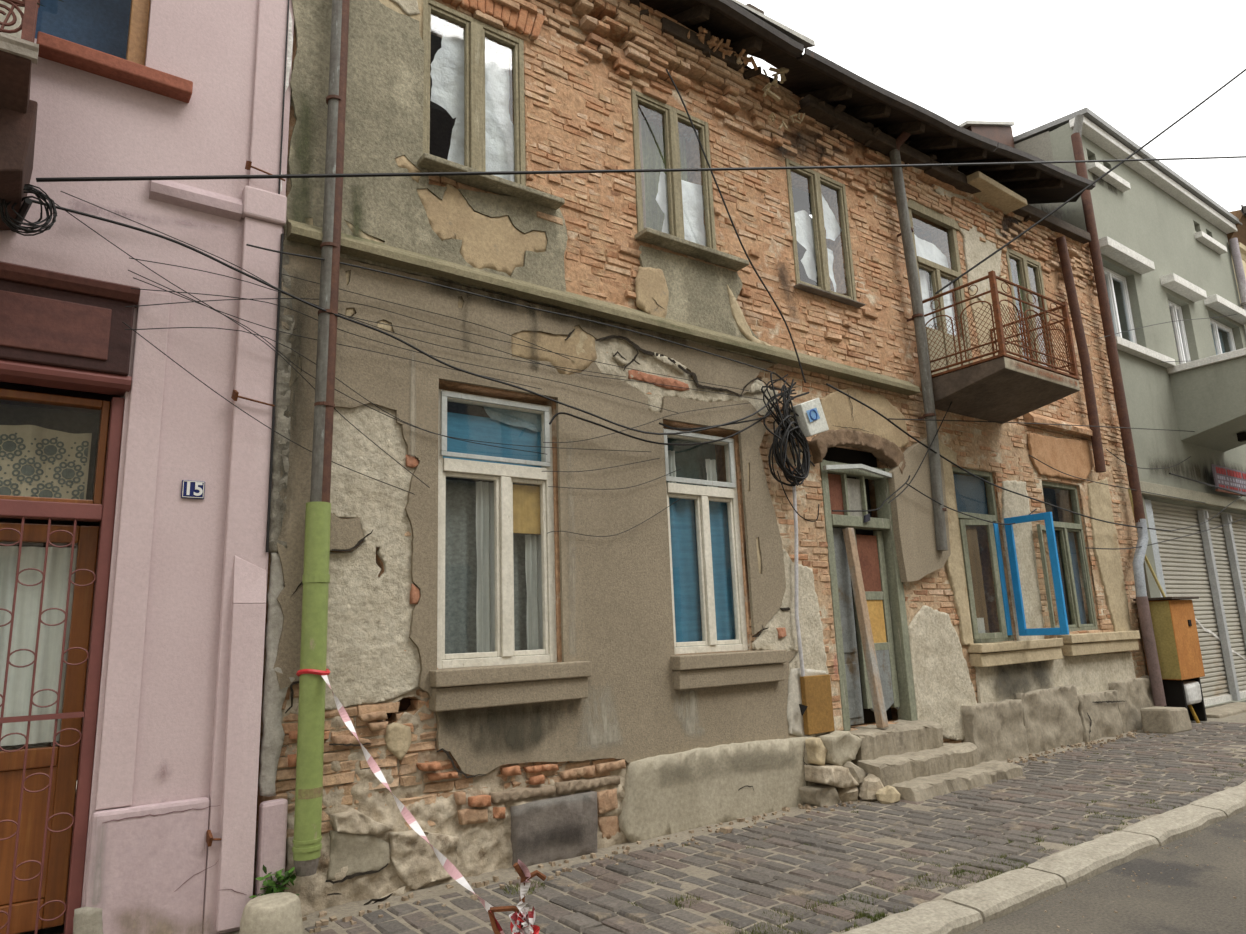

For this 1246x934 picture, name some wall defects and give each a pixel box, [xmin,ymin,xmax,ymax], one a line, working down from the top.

peeling [390,0,420,17]
flaking render [395,0,1148,731]
spalling [321,404,488,837]
flaking render [262,683,299,814]
flaking render [497,758,627,789]